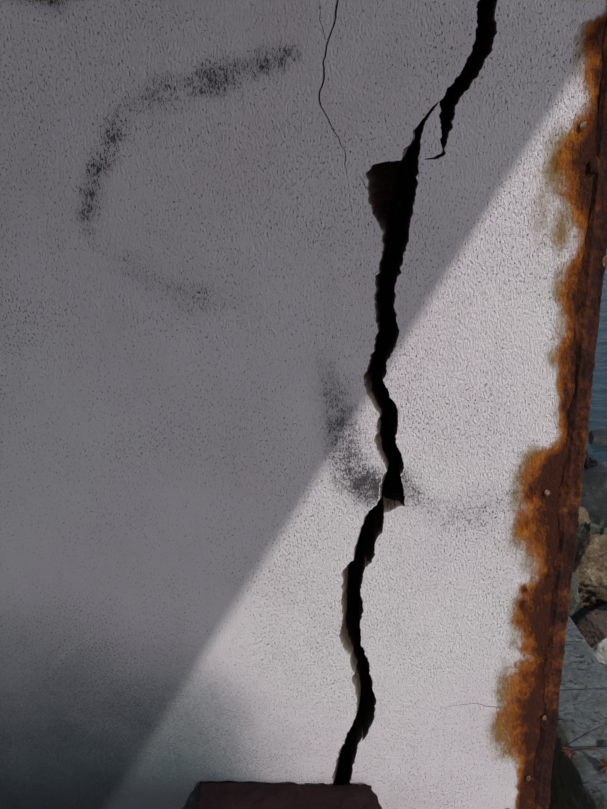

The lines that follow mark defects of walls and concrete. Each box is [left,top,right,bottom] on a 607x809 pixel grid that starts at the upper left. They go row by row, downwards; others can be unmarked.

crack [318,0,366,187]
crack [332,0,498,786]
corrosion [492,14,607,809]